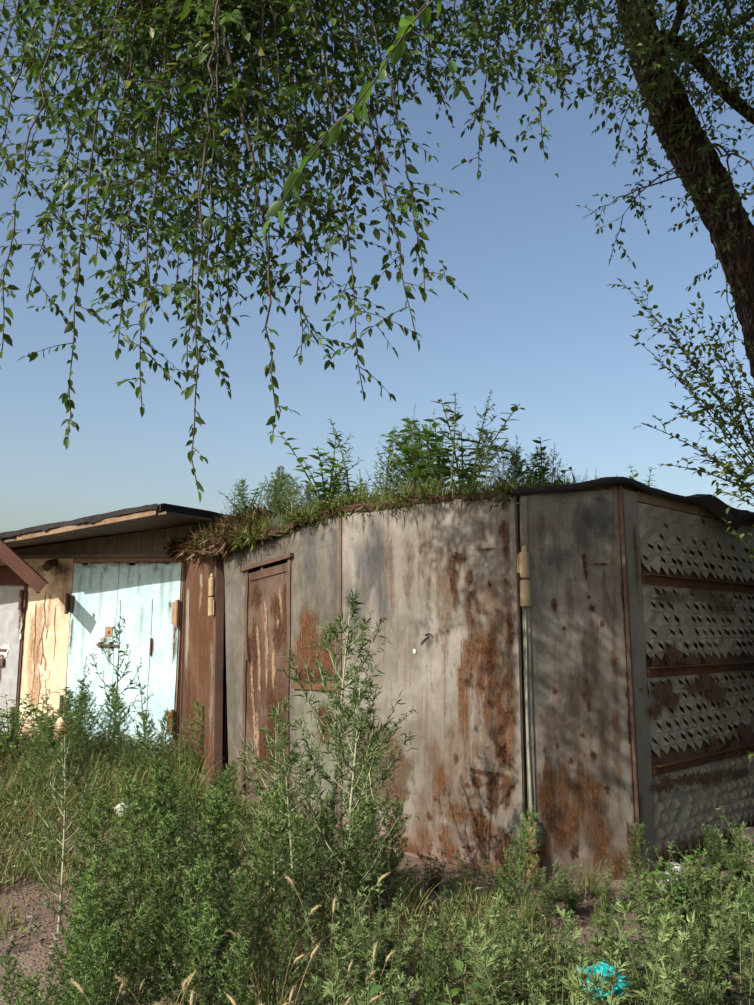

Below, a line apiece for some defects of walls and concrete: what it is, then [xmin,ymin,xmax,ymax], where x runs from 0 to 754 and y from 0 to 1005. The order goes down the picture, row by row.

corrosion [187,574,213,720]
corrosion [255,686,283,781]
corrosion [249,583,339,684]
corrosion [389,522,527,882]
corrosion [536,641,732,879]
corrosion [652,766,751,794]